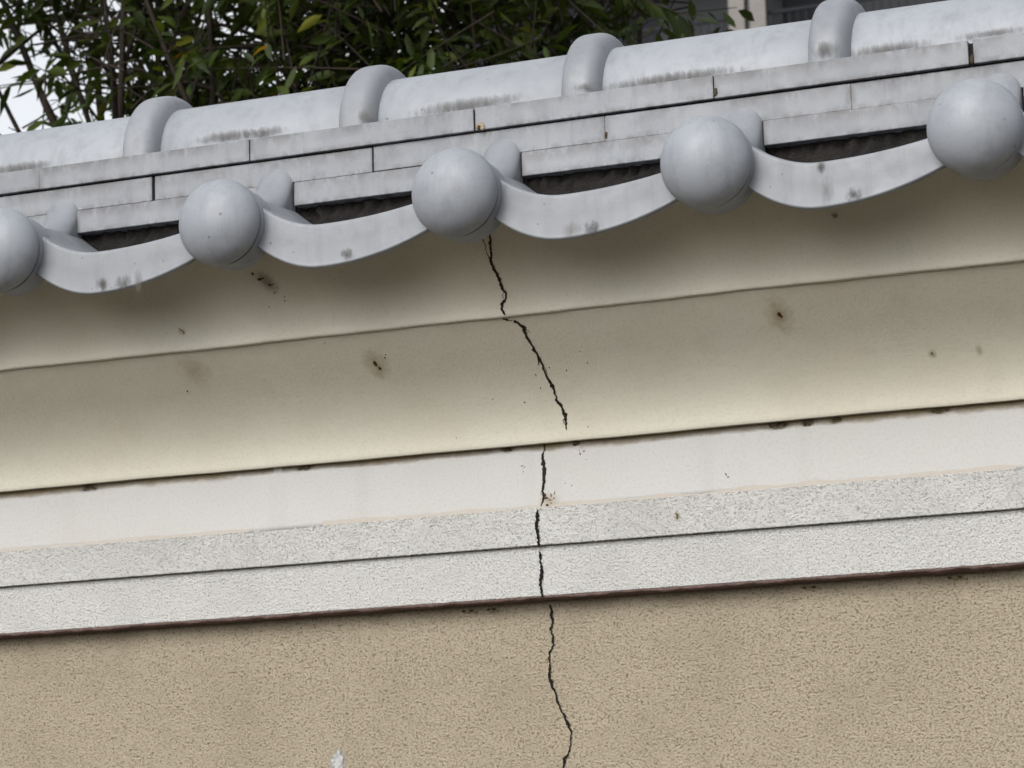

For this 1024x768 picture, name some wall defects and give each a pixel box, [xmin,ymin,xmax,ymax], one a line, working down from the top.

crack [482,234,568,430]
crack [535,444,572,768]